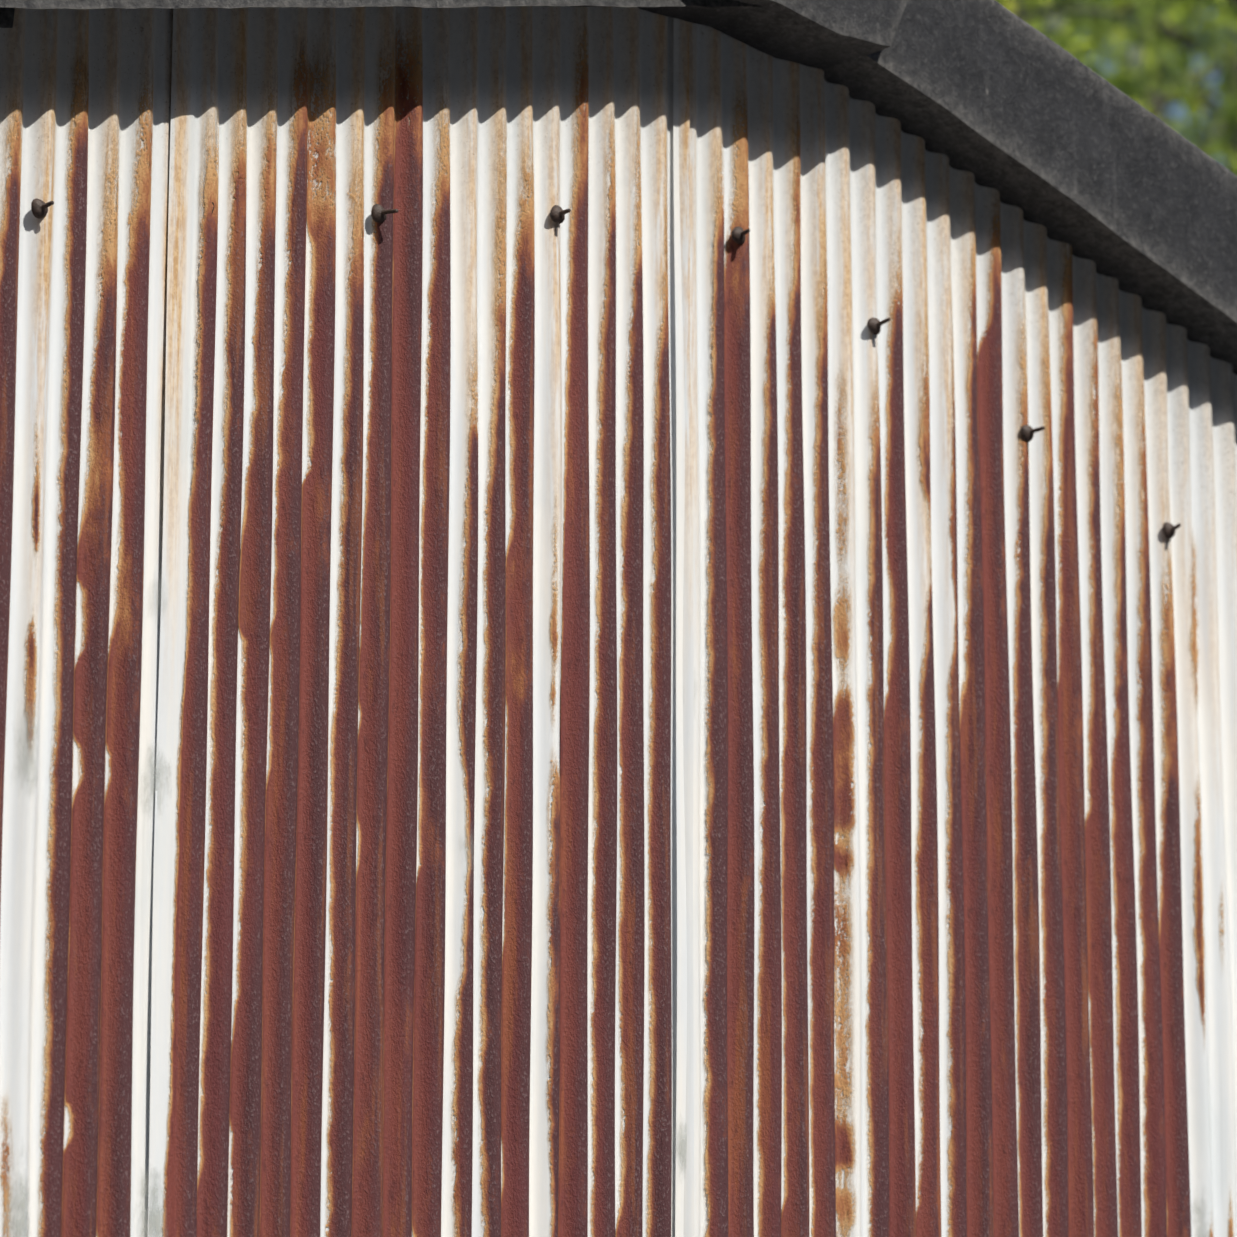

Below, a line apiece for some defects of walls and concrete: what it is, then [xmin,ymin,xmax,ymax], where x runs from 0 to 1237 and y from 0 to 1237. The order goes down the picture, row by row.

corrosion [0,1104,12,1237]
corrosion [0,104,23,912]
corrosion [25,619,37,747]
corrosion [32,432,40,551]
corrosion [38,56,154,1237]
corrosion [162,30,535,1237]
corrosion [547,30,672,1237]
corrosion [703,100,1205,1237]